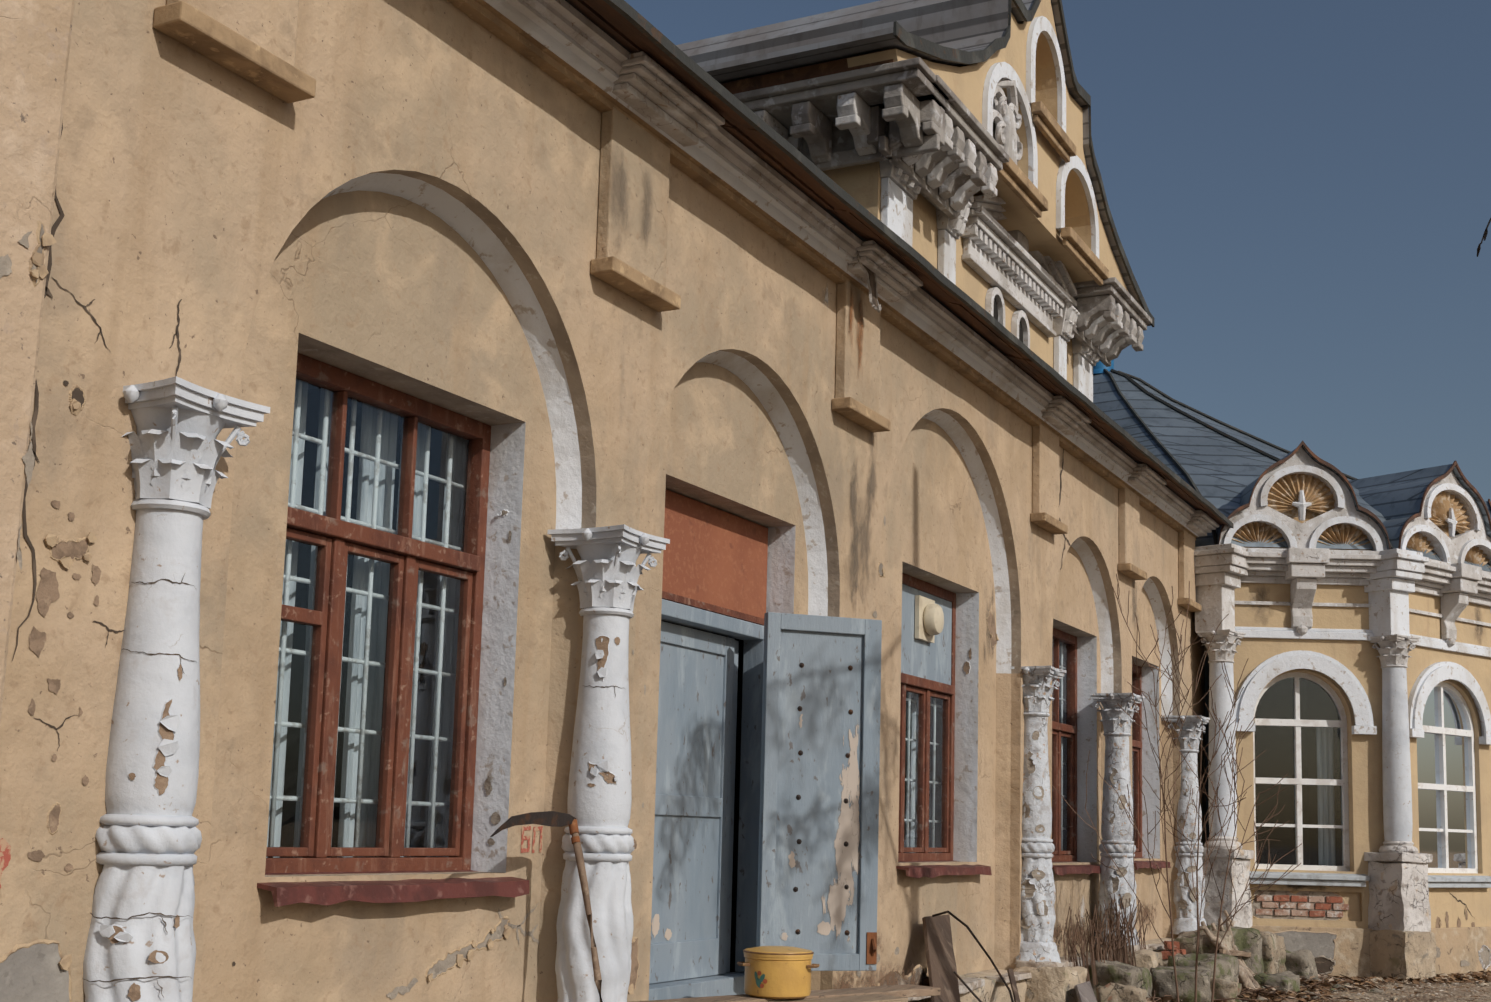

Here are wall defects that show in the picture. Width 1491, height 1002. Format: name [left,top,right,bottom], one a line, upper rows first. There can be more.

crack [44,188,111,352]
crack [169,299,182,376]
crack [12,380,39,661]
peeling [29,500,101,657]
crack [93,621,192,674]
peeling [595,635,634,682]
peeling [152,698,180,796]
peeling [587,760,619,787]
crack [91,912,193,932]
flaking render [1251,890,1349,975]
peeling [127,983,141,1002]
crack [82,976,192,996]